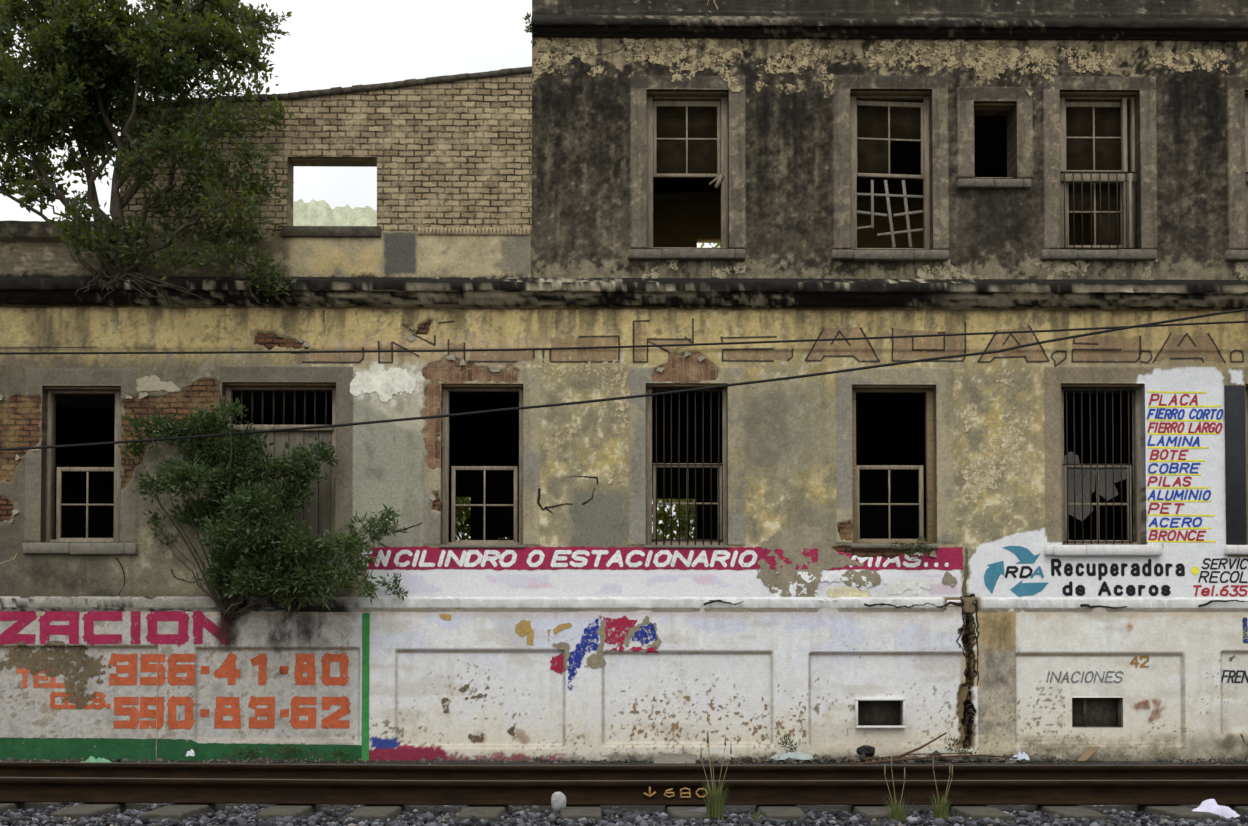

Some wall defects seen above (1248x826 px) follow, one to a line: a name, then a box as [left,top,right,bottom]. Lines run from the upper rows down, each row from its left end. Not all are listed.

flaking render [652,352,718,383]
flaking render [0,394,43,523]
flaking render [121,375,223,490]
flaking render [349,354,519,470]
peeling [756,521,937,601]
peeling [942,571,957,587]
peeling [0,641,111,710]
peeling [515,615,662,690]
crack [864,548,979,748]